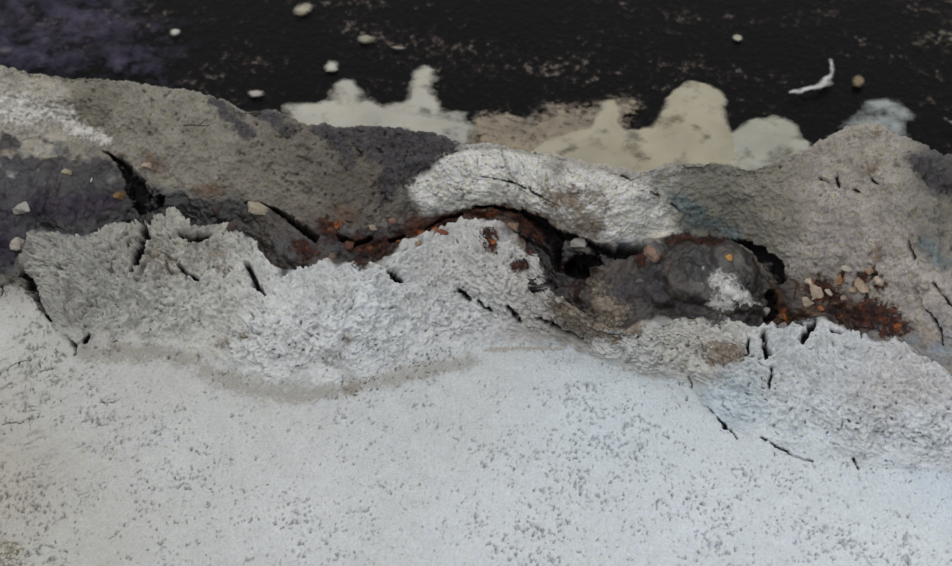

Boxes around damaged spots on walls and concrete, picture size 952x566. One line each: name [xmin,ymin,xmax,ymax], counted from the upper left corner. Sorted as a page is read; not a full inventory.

leakage [0,82,113,146]
leakage [0,196,25,261]
leakage [25,186,122,227]
corrosion [288,239,320,262]
corrosion [315,202,545,272]
corrosion [665,229,725,245]
crack [24,273,52,322]
corrosion [764,282,796,325]
corrosion [803,266,914,342]